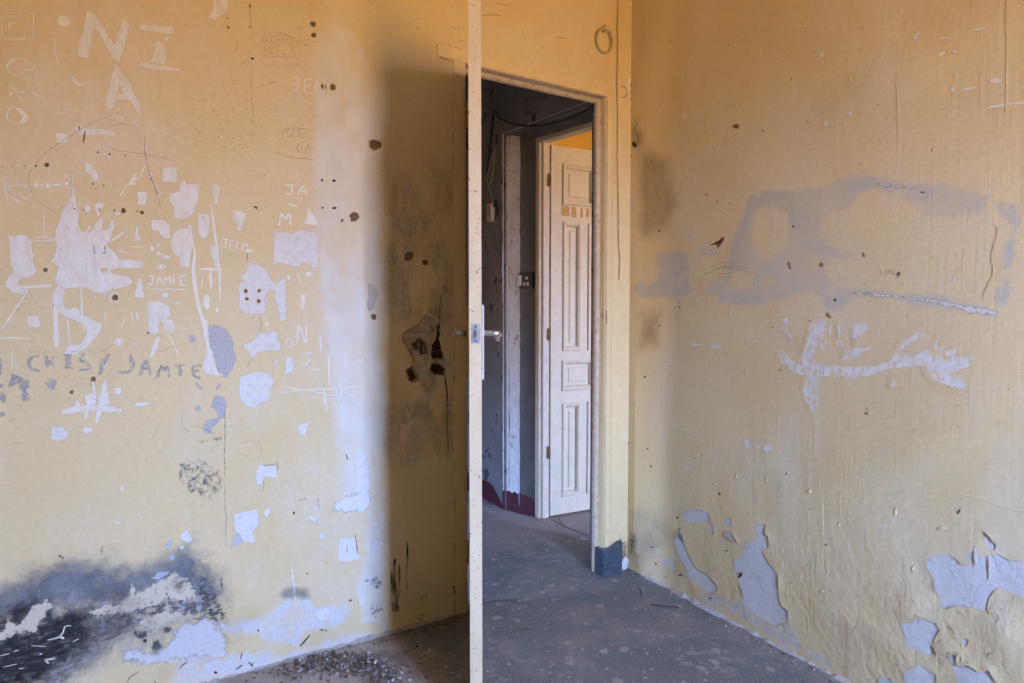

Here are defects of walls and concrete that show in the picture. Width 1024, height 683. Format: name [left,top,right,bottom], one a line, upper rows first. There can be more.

spalling [189,318,236,434]
water stain [0,5,429,683]
spalling [401,314,448,395]
peeling [674,509,788,626]
peeling [910,532,1024,611]
peeling [948,638,996,683]